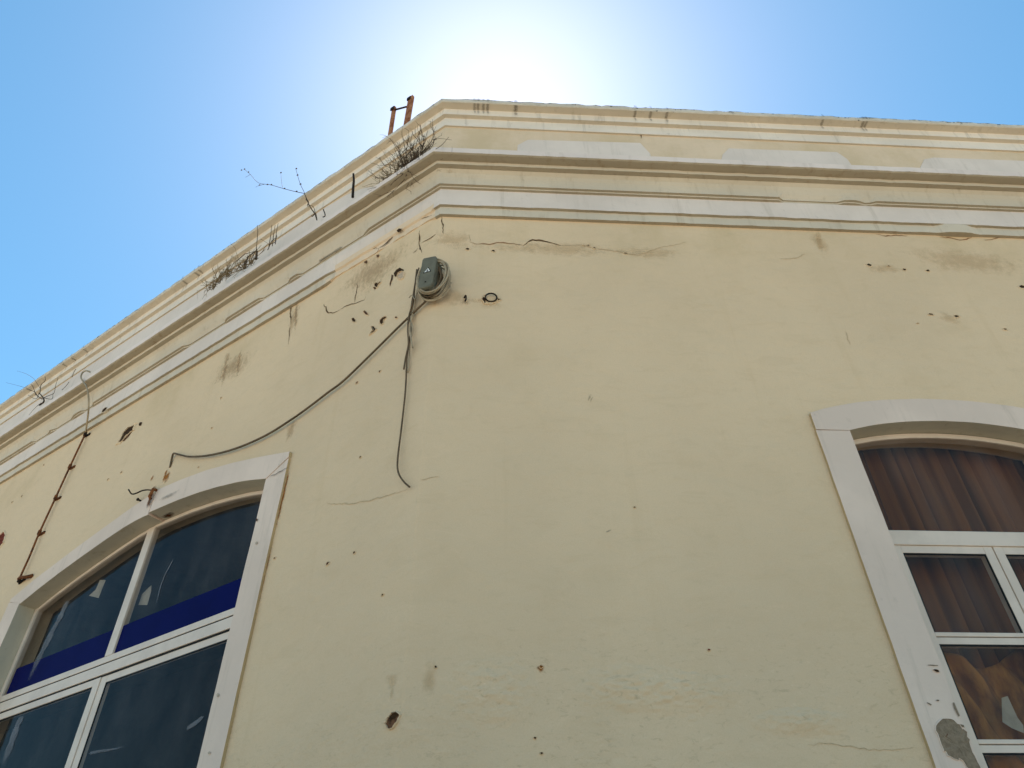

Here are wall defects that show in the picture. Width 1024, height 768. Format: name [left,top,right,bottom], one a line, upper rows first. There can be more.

crack [469,236,558,245]
flaking render [373,268,405,289]
flaking render [352,310,398,336]
flaking render [115,422,142,446]
flaking render [384,711,401,731]
peeling [935,702,981,768]